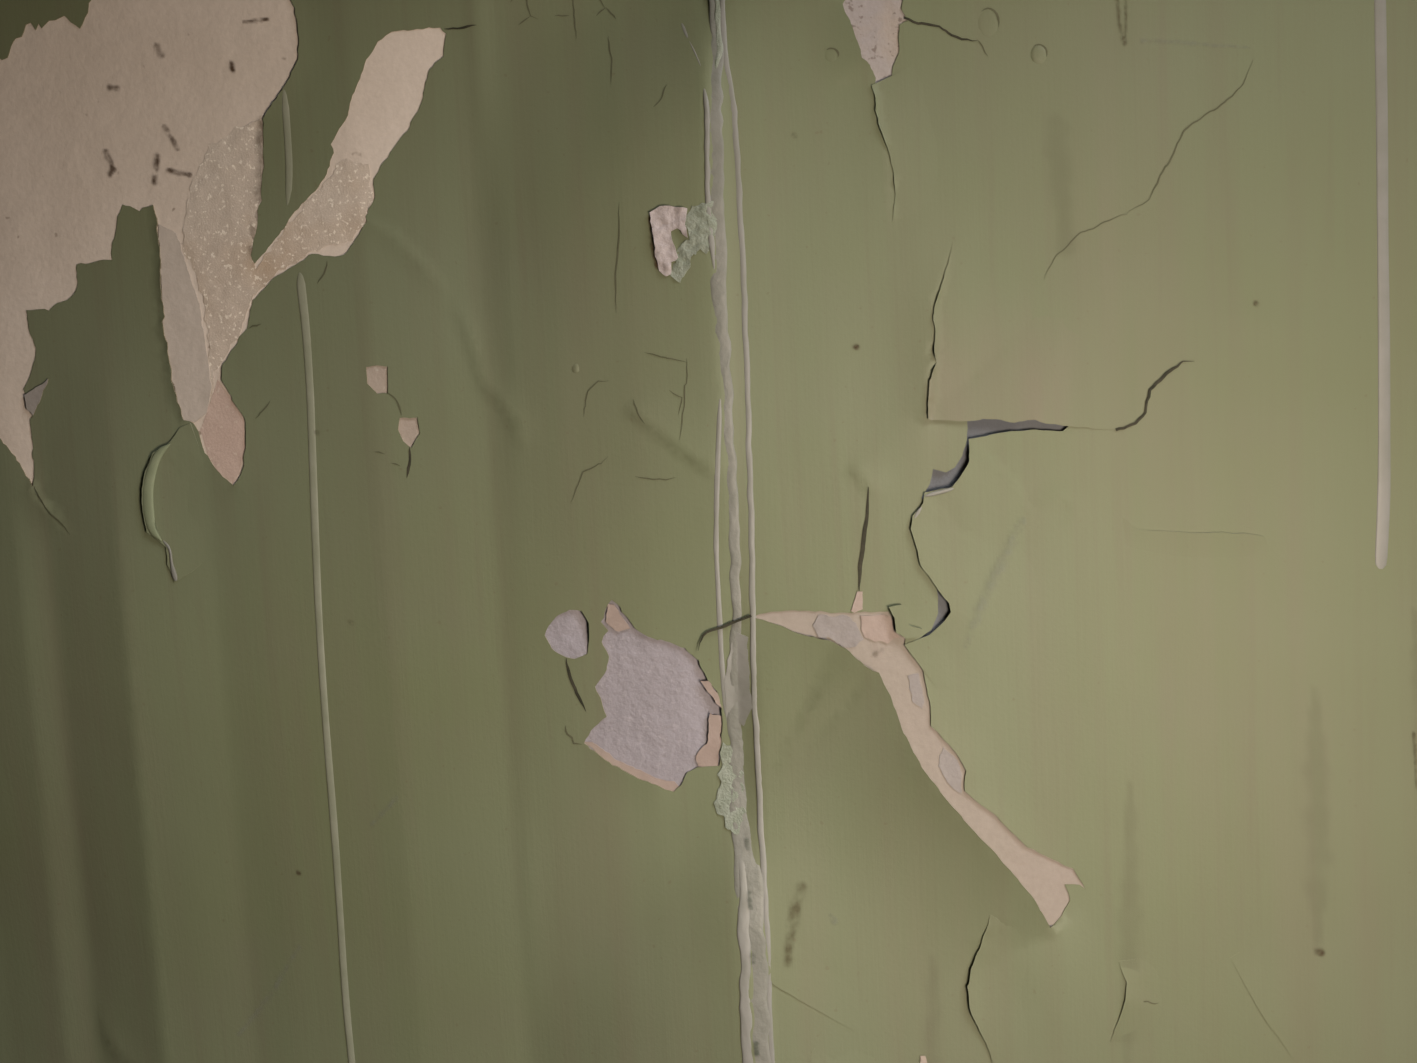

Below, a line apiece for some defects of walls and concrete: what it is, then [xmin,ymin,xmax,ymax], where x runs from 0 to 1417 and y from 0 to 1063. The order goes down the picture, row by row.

peeling [843,0,907,83]
peeling [0,0,446,582]
flaking render [649,201,717,283]
crack [1044,61,1253,279]
crack [1116,361,1192,431]
spalling [545,600,723,791]
peeling [756,419,1116,927]